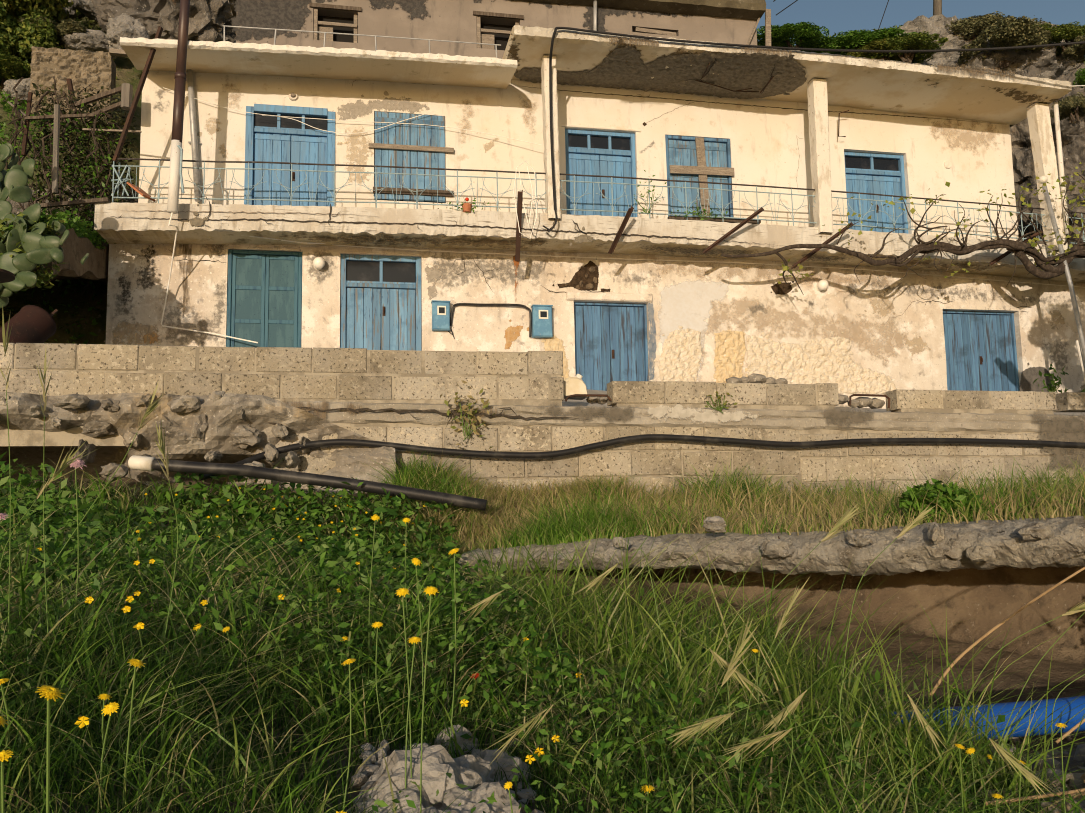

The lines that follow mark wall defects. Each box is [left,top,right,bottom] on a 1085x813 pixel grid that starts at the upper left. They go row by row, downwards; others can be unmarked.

spalling [514,68,542,83]
spalling [557,45,807,99]
peeling [337,91,430,183]
water stain [119,245,157,301]
water stain [179,244,193,316]
spalling [771,281,794,295]
flaking render [654,326,897,394]
peeling [907,337,930,355]